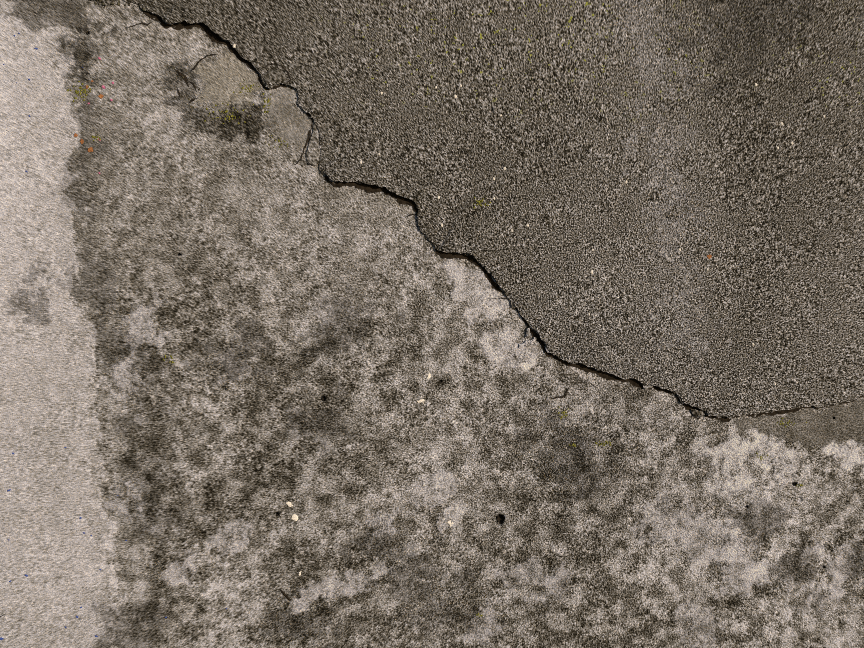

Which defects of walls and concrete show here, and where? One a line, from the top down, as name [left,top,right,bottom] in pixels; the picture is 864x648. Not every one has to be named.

crack [126,11,291,103]
mould [165,56,277,145]
crack [294,112,313,165]
crack [325,176,418,218]
peeling [92,0,864,419]
water stain [610,0,709,367]
water stain [110,292,171,399]
water stain [441,259,542,371]
crack [435,249,864,422]
water stain [206,519,252,555]
water stain [632,398,864,596]
water stain [259,563,393,648]